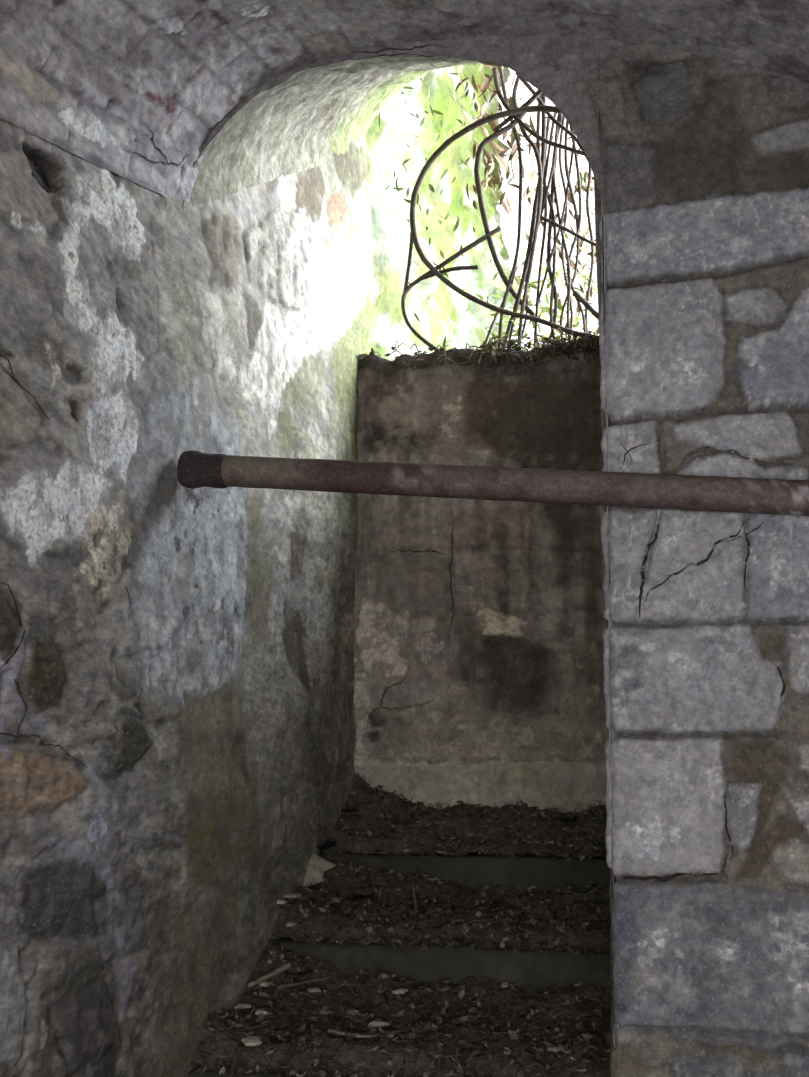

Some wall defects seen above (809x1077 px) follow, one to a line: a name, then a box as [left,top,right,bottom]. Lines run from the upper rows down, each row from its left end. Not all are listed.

water stain [432,362,603,471]
crack [639,513,766,617]